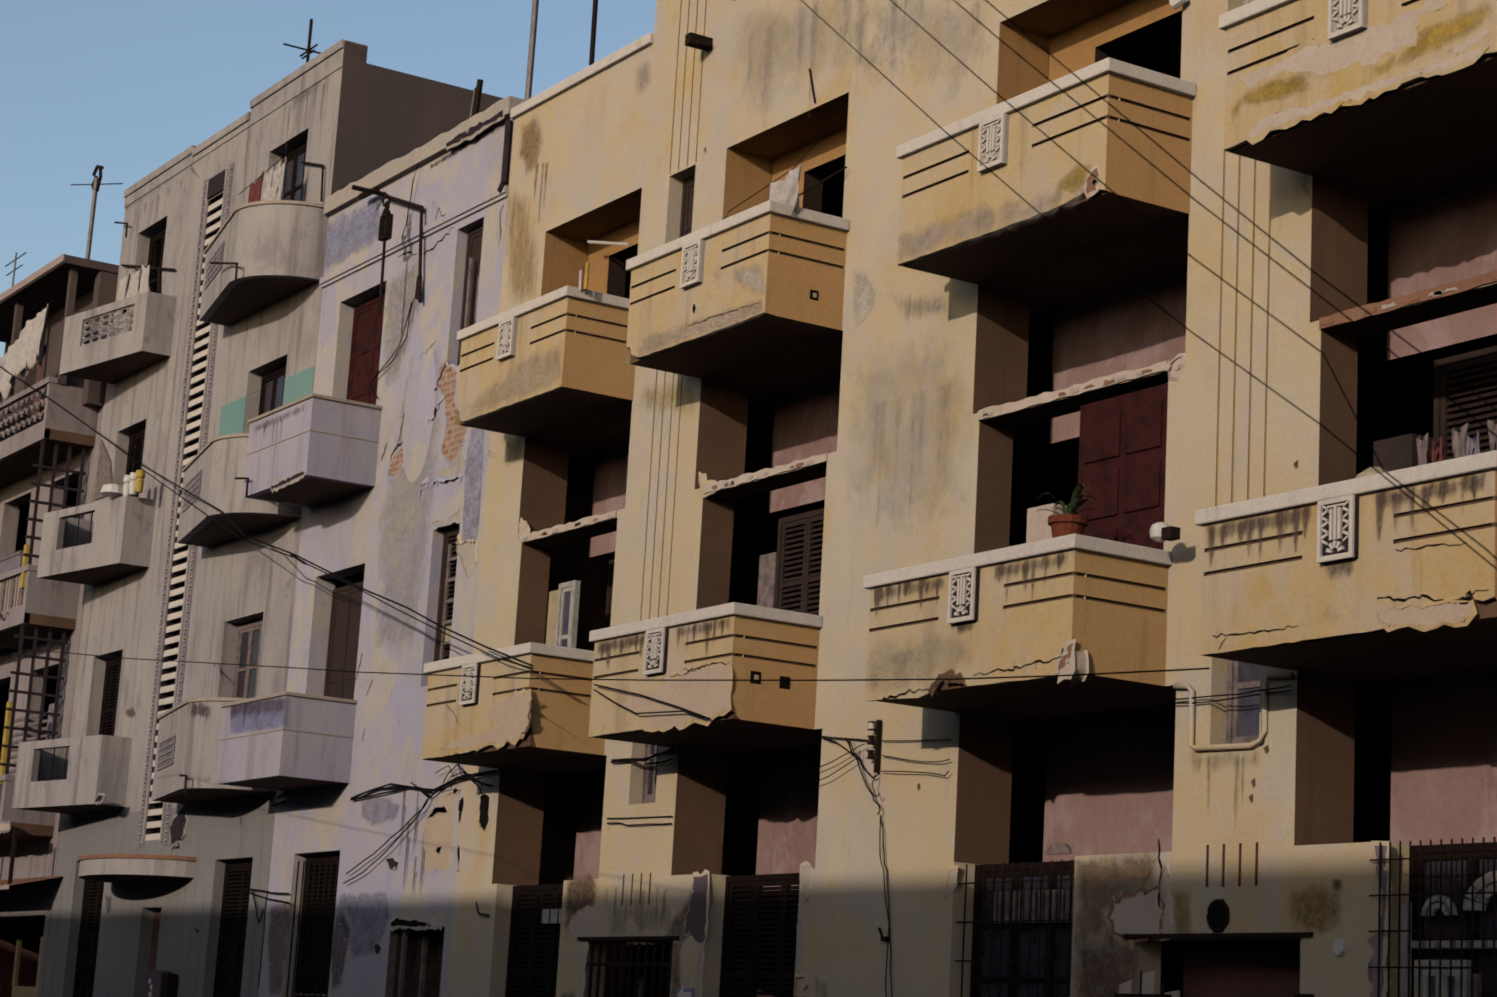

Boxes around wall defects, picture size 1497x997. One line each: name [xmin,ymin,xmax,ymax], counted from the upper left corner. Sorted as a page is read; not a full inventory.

peeling [1235,0,1492,145]
peeling [1364,287,1458,314]
flaking render [1058,353,1188,397]
peeling [386,276,496,579]
flaking render [1375,597,1477,632]
peeling [437,688,531,755]
peeling [339,894,447,956]
damp [1076,855,1155,997]
flaking render [1107,861,1175,944]